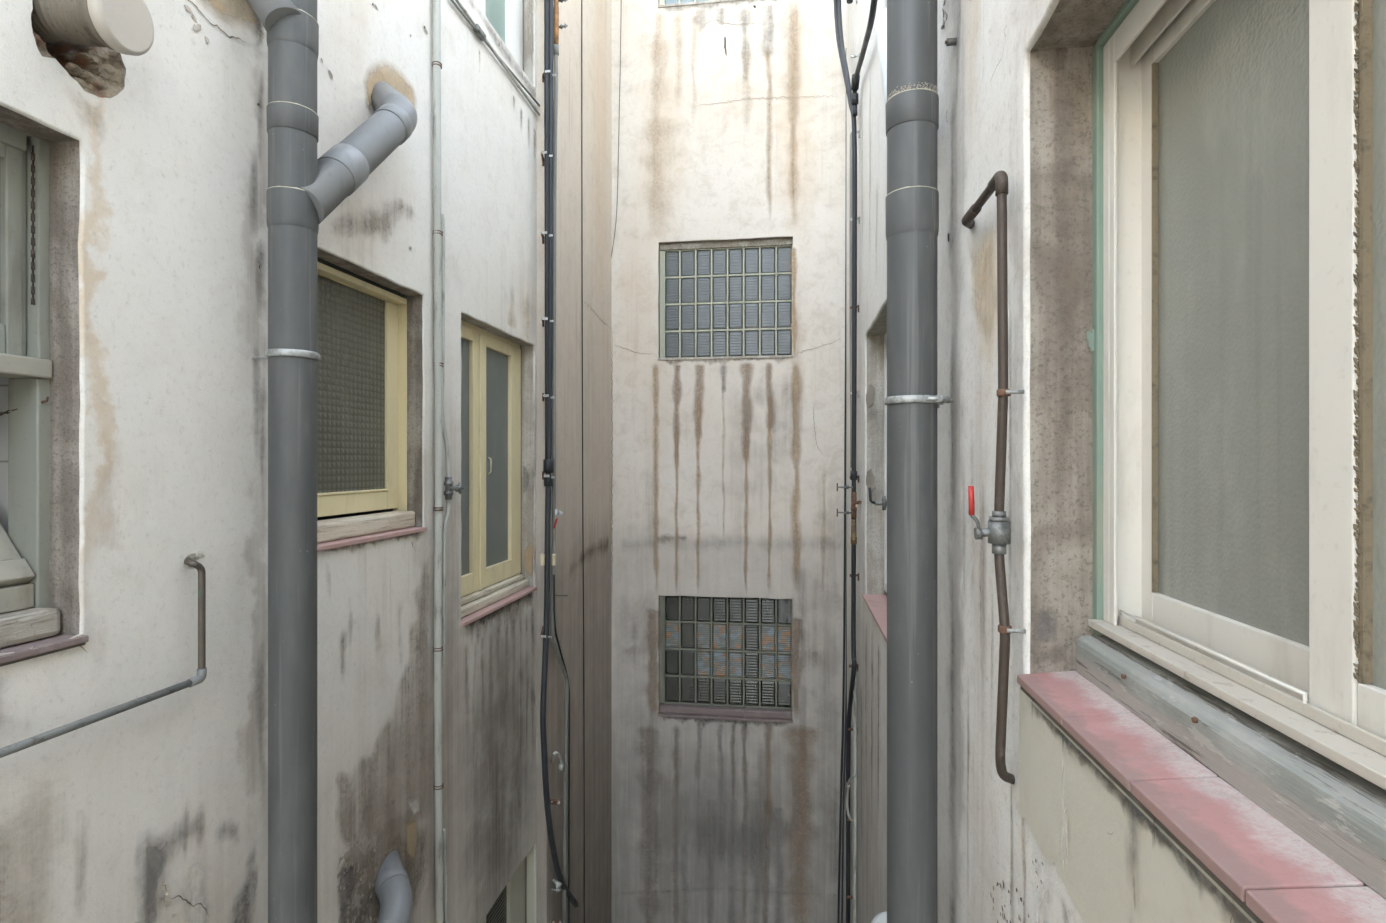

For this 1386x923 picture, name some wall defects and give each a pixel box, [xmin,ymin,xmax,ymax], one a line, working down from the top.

spalling [31,0,126,98]
water stain [147,0,261,70]
water stain [146,839,176,922]
water stain [234,878,251,923]